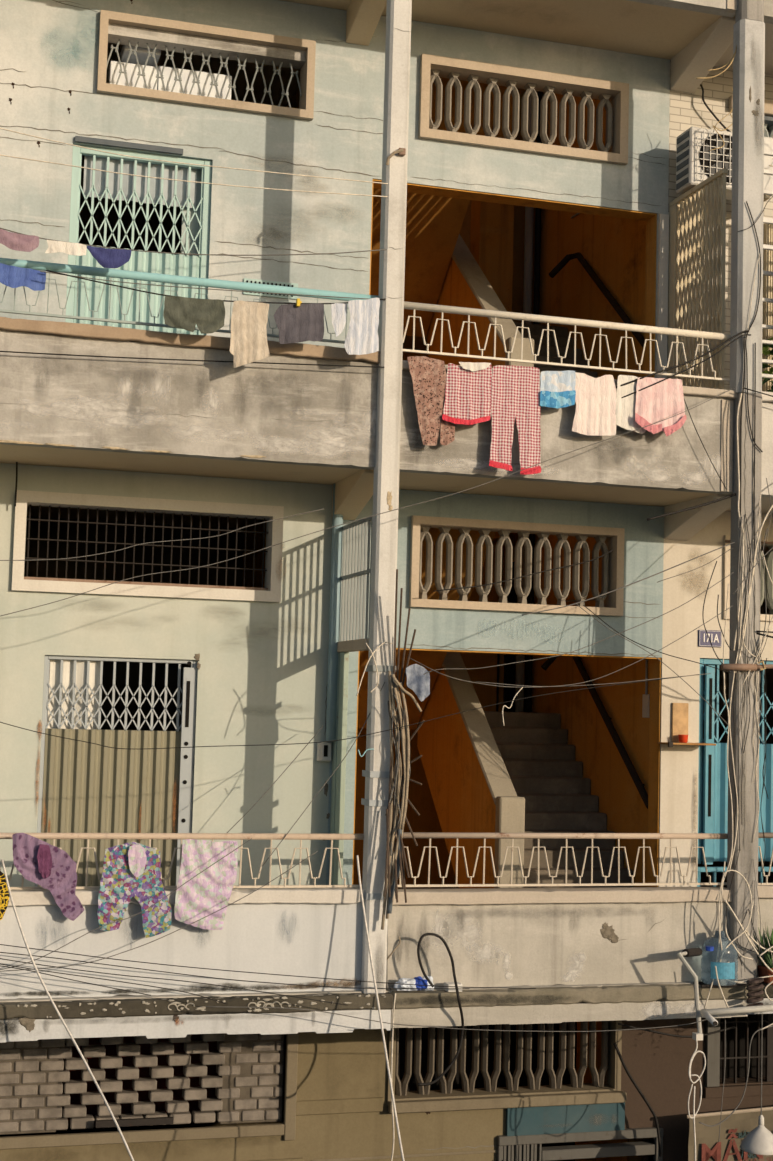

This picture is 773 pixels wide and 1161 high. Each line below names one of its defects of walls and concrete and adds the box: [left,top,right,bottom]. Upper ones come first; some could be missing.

leakage [27,372,169,426]
leakage [257,410,377,455]
spalling [600,922,619,943]
spalling [17,1001,126,1032]
peeling [142,997,225,1022]
peeling [242,993,386,1012]